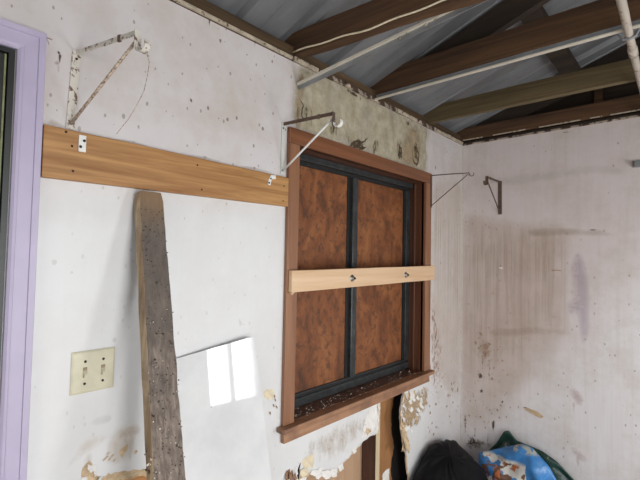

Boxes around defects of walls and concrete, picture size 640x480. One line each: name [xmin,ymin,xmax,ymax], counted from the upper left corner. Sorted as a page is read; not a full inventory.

damp [295,70,427,171]
spalling [81,461,147,480]
spalling [285,403,380,480]
peeling [400,386,431,480]